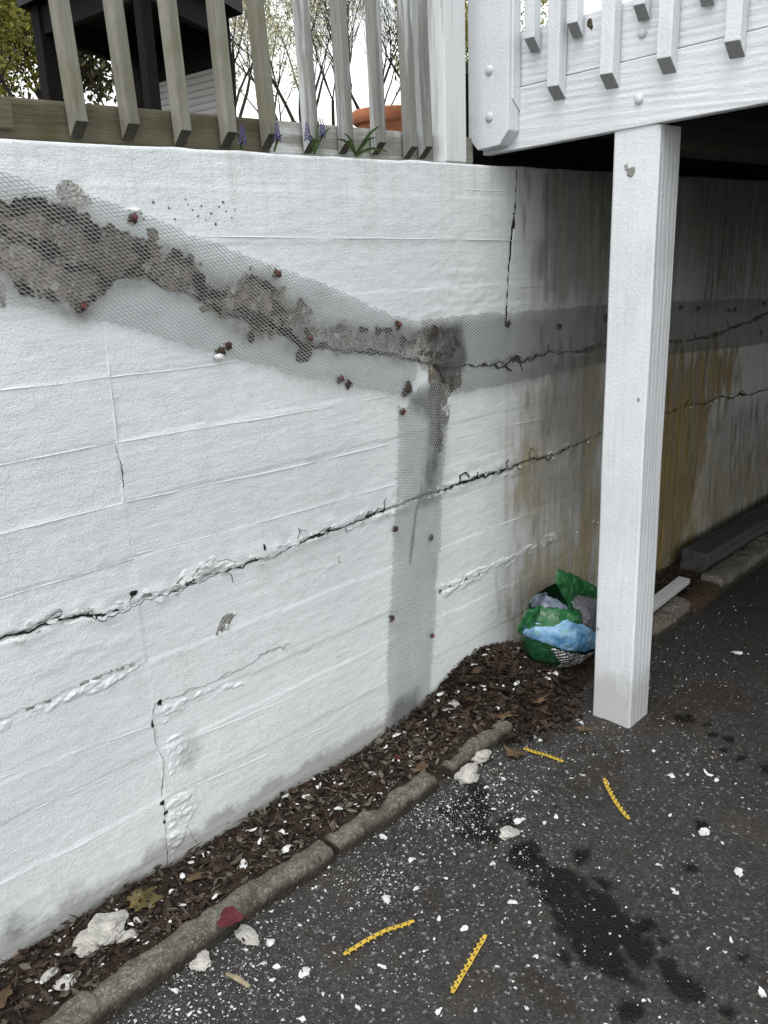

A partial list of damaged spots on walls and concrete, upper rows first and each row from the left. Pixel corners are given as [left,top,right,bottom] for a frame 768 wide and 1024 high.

spalling [0,180,462,453]
crack [0,432,601,643]
crack [3,231,607,392]
leakage [413,330,466,501]
crack [505,170,517,323]
corrosion [655,339,739,573]
crack [664,389,768,414]
crack [670,313,768,345]
crack [151,644,310,862]